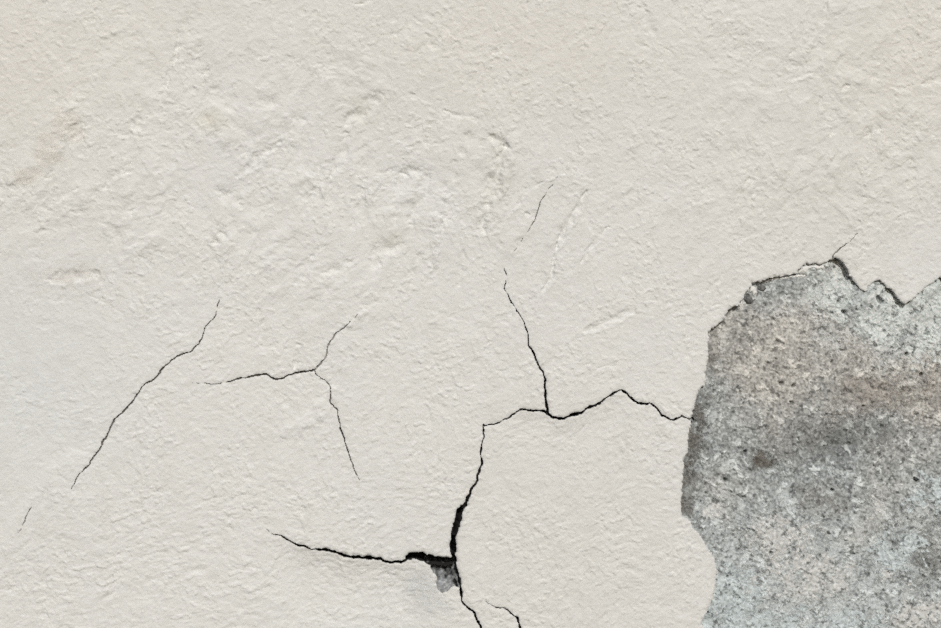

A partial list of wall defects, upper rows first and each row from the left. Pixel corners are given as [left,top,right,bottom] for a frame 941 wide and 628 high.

crack [71,300,220,489]
crack [192,315,360,480]
crack [266,176,694,628]
spalling [680,258,941,628]